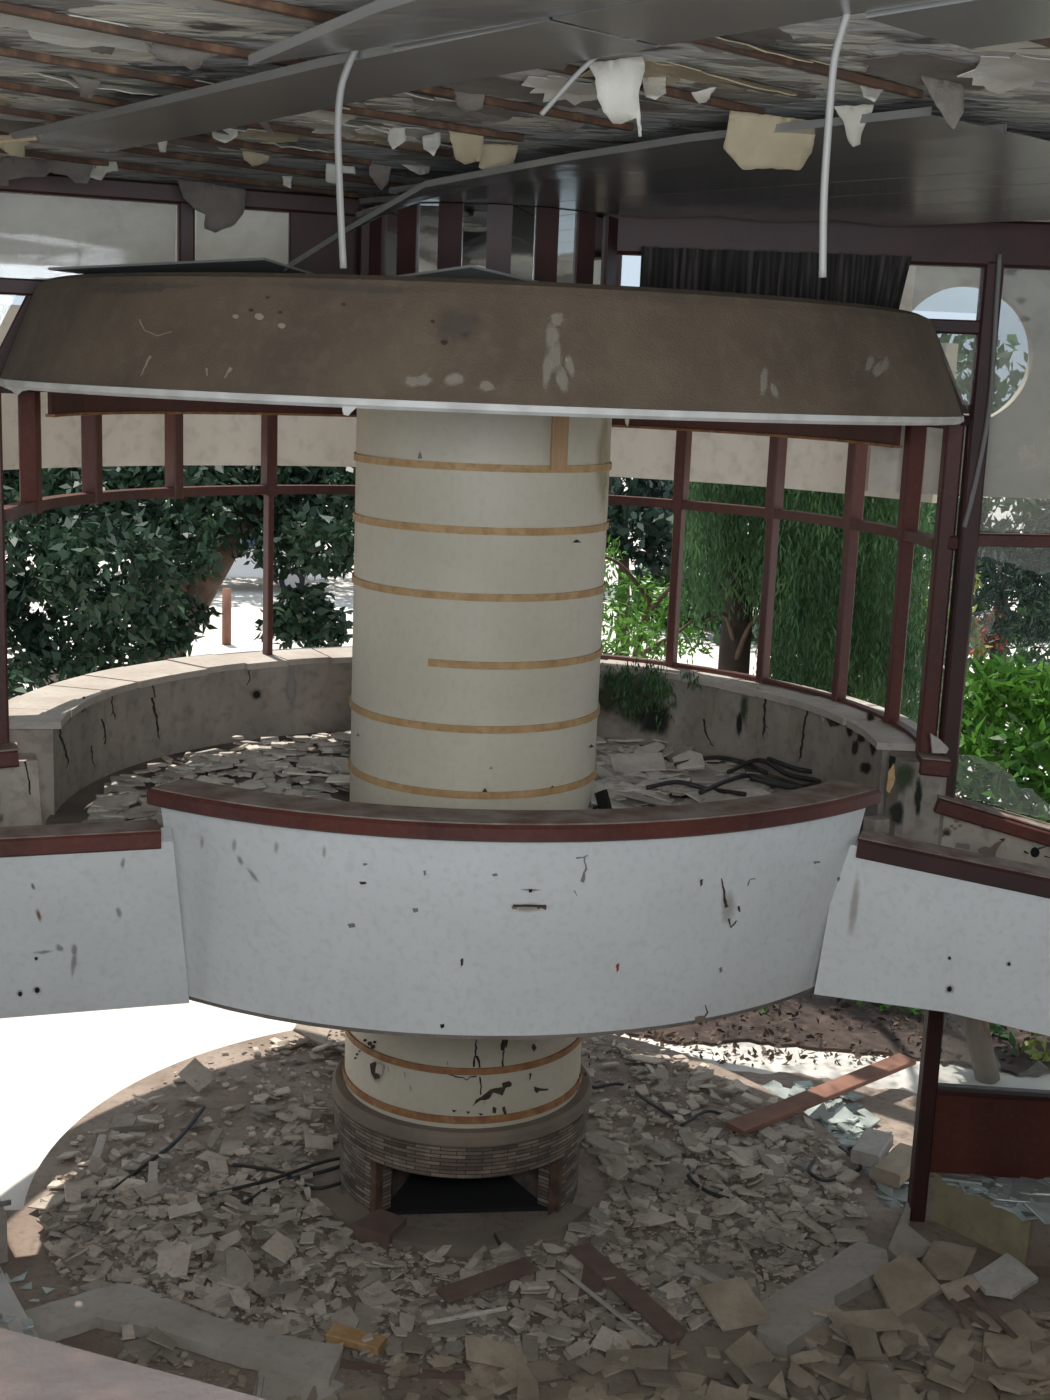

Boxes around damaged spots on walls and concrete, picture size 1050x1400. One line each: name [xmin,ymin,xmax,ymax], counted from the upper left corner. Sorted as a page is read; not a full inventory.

peeling [0,97,119,186]
peeling [0,13,215,111]
peeling [158,55,819,191]
peeling [682,27,1050,147]
crack [59,696,116,769]
crack [151,685,160,739]
crack [761,699,769,740]
crack [798,711,808,761]
crack [23,761,31,795]
peeling [354,1039,383,1079]
peeling [452,1040,512,1116]